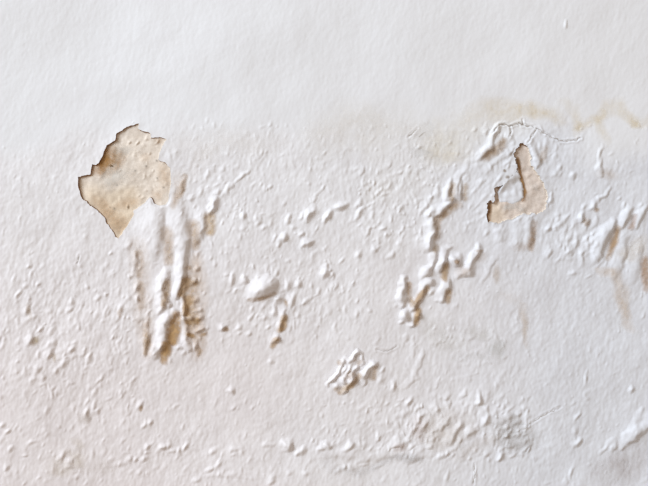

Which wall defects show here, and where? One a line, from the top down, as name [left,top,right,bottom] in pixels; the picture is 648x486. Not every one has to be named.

crack [492,121,575,142]
peeling [78,123,171,239]
peeling [486,143,548,224]